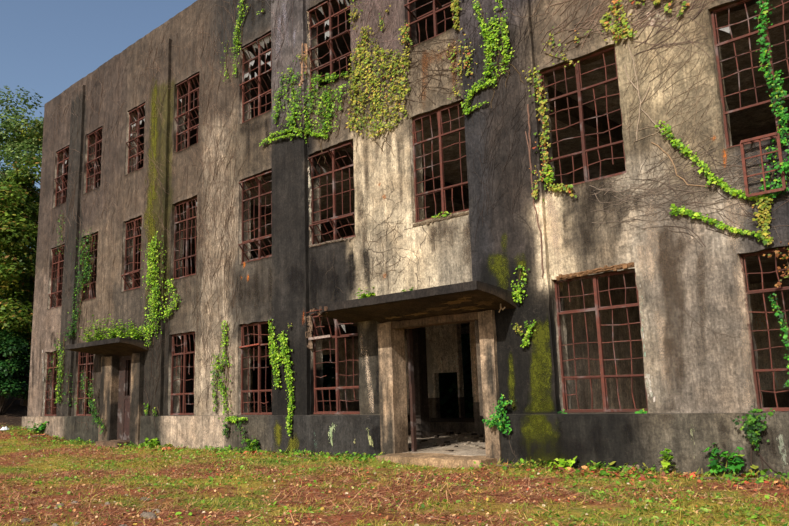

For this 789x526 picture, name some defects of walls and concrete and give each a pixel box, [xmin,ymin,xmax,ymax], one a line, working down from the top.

damp [638,228,684,328]
damp [737,269,746,317]